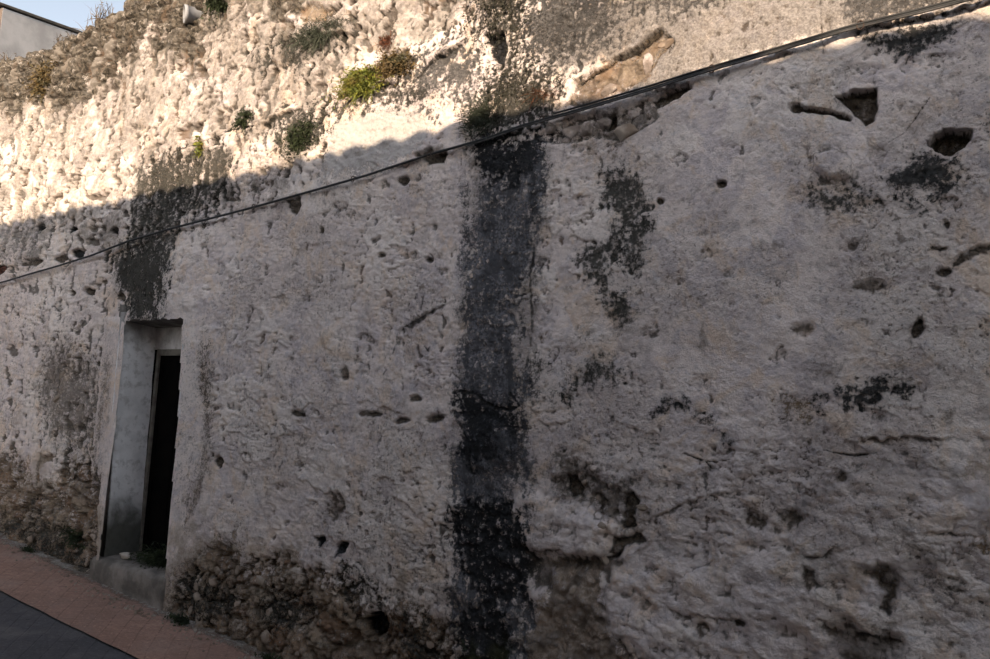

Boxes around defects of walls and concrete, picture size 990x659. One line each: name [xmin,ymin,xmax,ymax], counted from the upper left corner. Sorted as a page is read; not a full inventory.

flaking render [546,30,674,148]
leakage [104,130,239,320]
leakage [570,160,656,337]
leakage [893,189,929,218]
leakage [444,0,633,659]
flaking render [0,334,100,574]
flaking render [543,450,648,538]
flaking render [163,530,455,659]
flaking render [520,557,636,659]